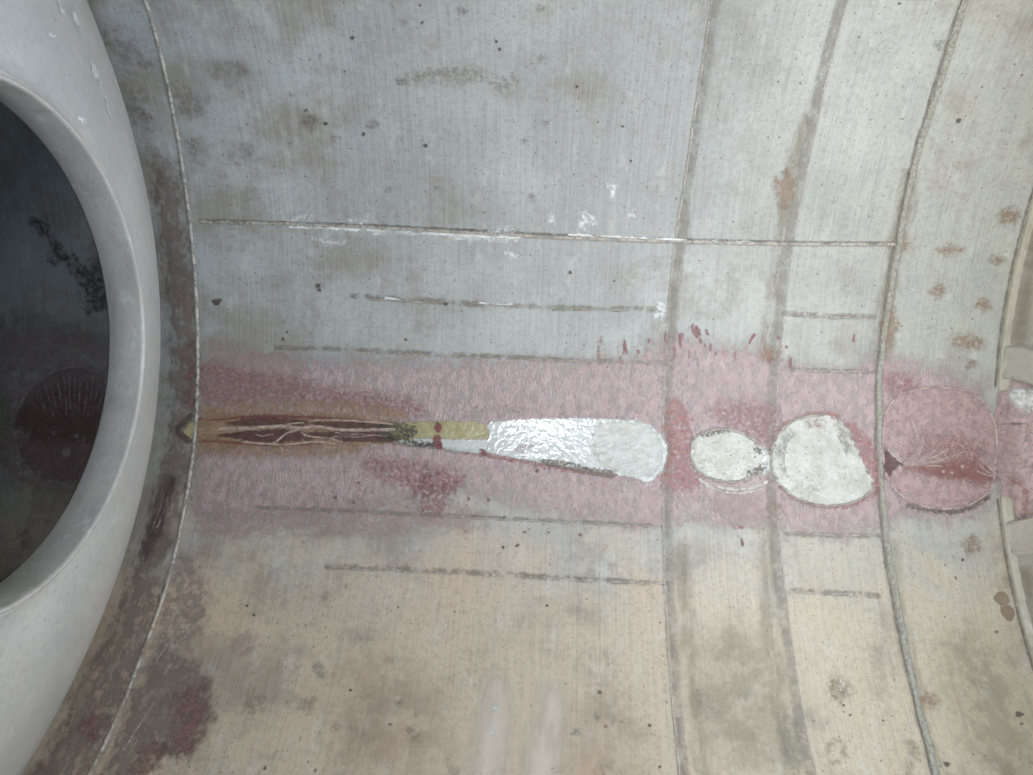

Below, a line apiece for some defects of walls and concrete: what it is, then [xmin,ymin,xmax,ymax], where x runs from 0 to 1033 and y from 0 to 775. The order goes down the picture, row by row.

corrosion [12,366,107,483]
corrosion [31,168,1033,775]